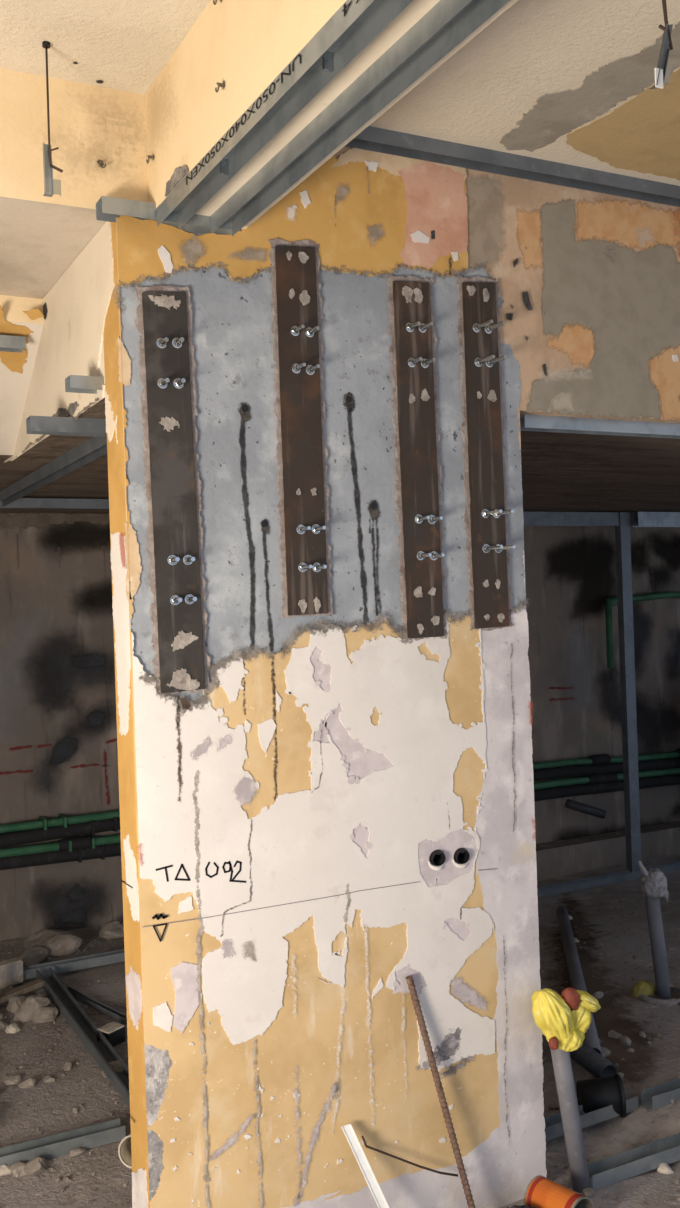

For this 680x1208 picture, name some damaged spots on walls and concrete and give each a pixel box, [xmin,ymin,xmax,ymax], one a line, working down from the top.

peeling [500,21,680,181]
peeling [0,302,47,374]
water stain [344,392,381,624]
water stain [31,637,114,709]
water stain [39,707,114,791]
water stain [238,402,278,801]
spalling [104,148,680,1208]
water stain [633,603,650,672]
water stain [636,698,680,754]
crack [192,770,252,1208]
crack [253,1040,264,1208]